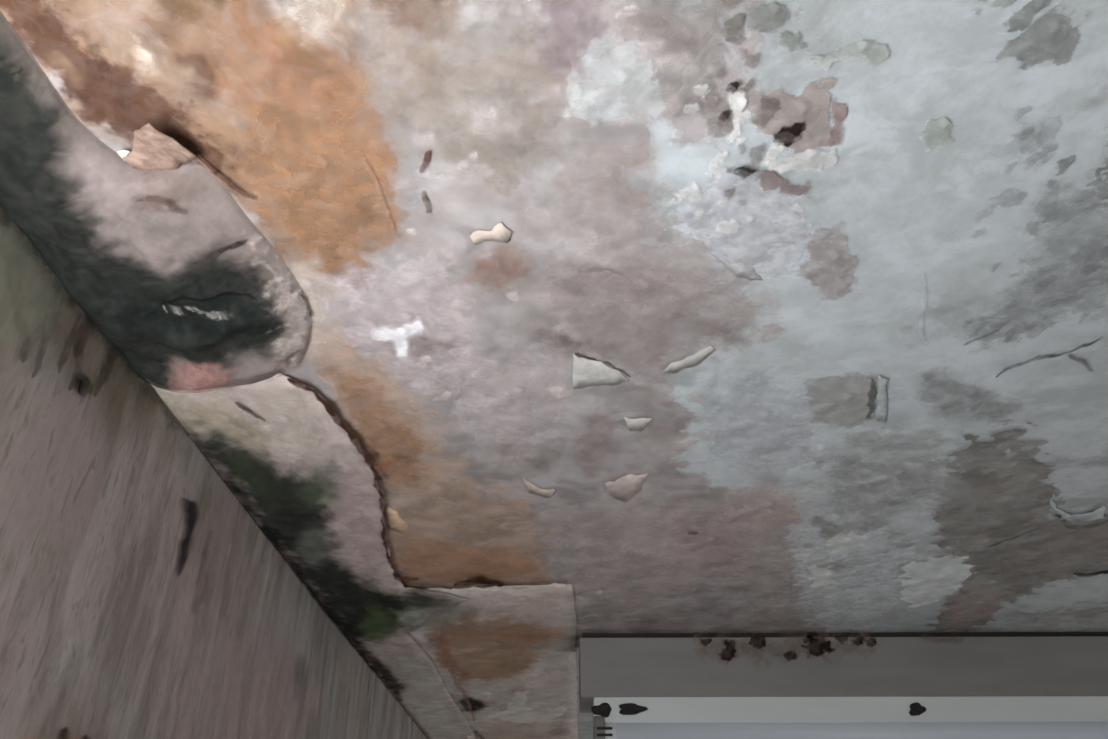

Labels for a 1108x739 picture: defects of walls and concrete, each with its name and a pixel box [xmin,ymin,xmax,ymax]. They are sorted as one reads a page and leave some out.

peeling [996,0,1080,70]
peeling [967,124,1108,344]
damp [0,43,555,701]
flaking render [151,0,889,739]
crack [287,378,418,582]
crack [453,577,503,587]
corrosion [701,639,736,661]
corrosion [749,633,766,649]
corrosion [783,633,876,660]
peeling [899,372,1108,633]